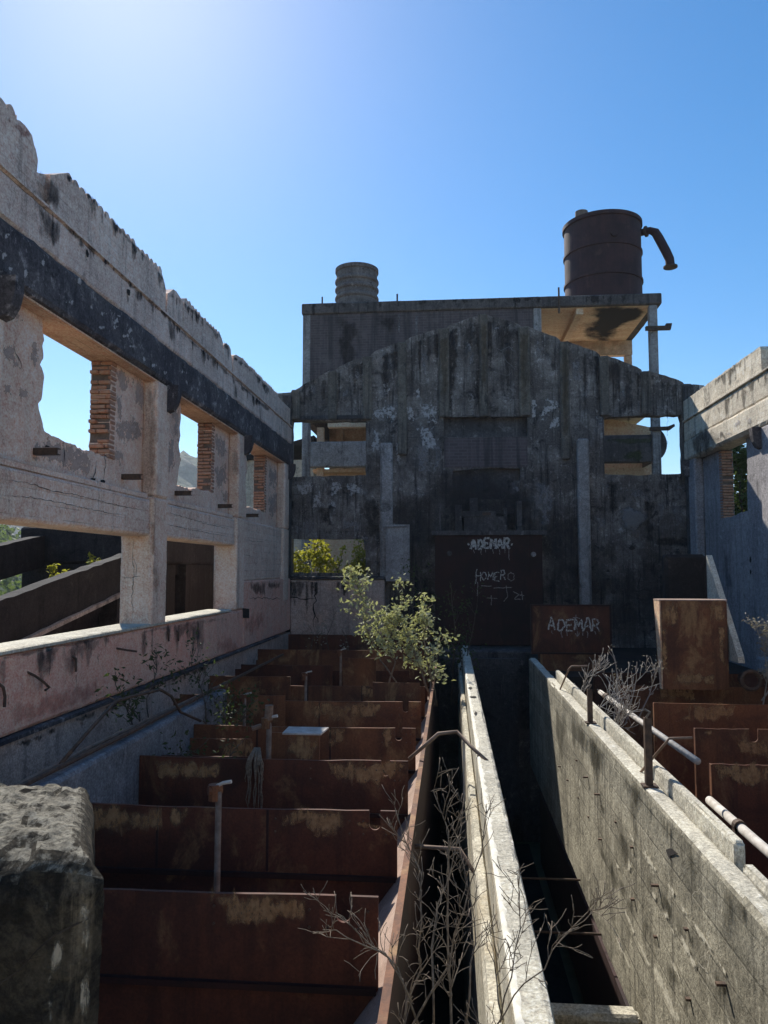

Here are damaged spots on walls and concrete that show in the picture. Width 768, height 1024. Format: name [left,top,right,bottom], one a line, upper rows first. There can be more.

damp [371,317,513,472]
damp [572,354,640,420]
damp [532,398,559,428]
rust [94,805,187,835]
rust [282,809,342,837]
rust [212,894,304,925]